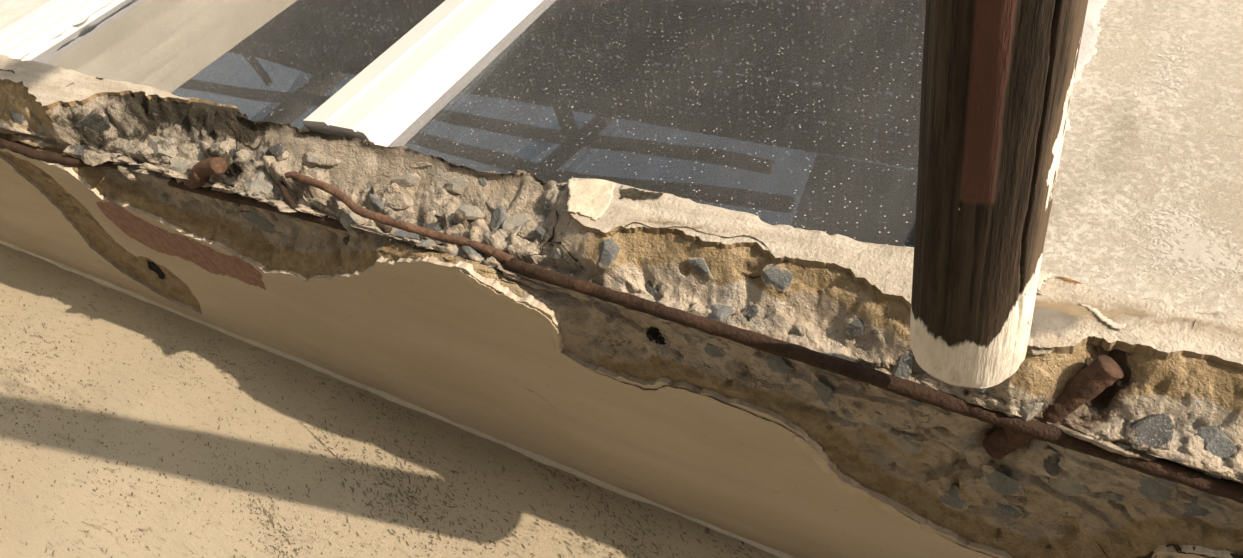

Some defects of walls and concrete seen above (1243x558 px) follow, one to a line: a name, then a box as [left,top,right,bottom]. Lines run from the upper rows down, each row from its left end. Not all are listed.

corrosion [0,138,118,170]
corrosion [165,177,348,232]
spalling [0,81,1243,484]
corrosion [503,258,1243,504]
crack [1097,543,1243,558]